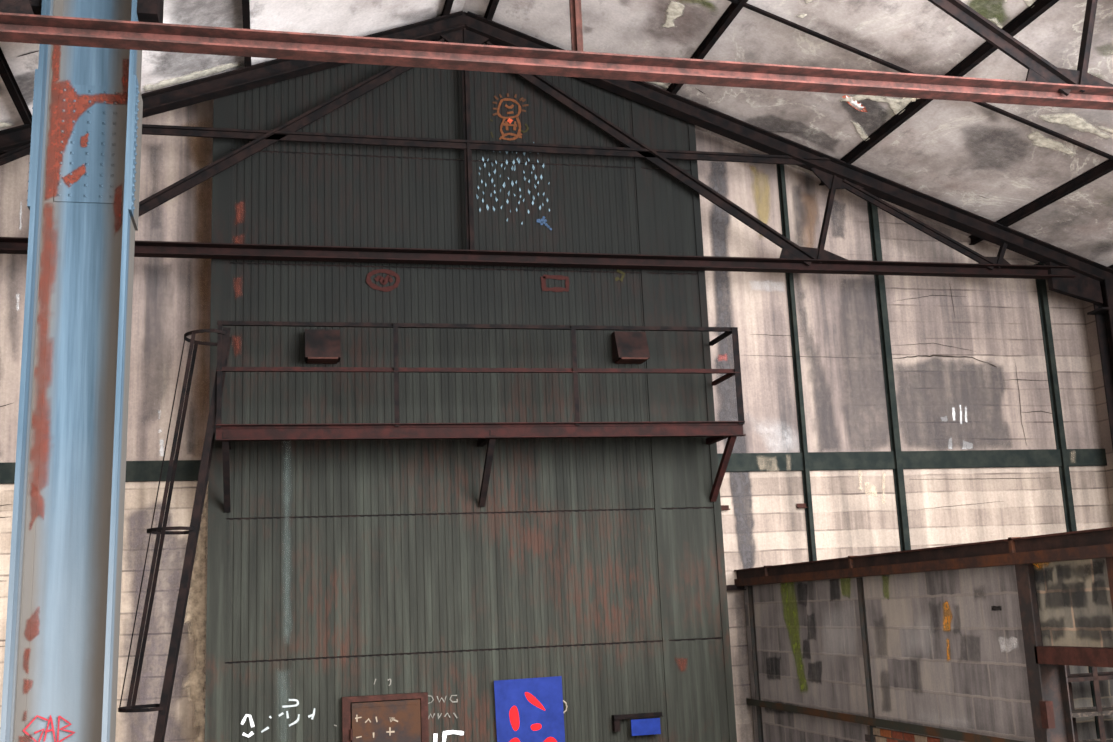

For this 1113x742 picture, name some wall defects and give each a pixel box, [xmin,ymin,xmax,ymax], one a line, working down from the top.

corrosion [30,45,129,529]
leakage [799,309,836,451]
leakage [842,280,1010,449]
corrosion [24,608,39,693]
flaking render [865,726,944,742]